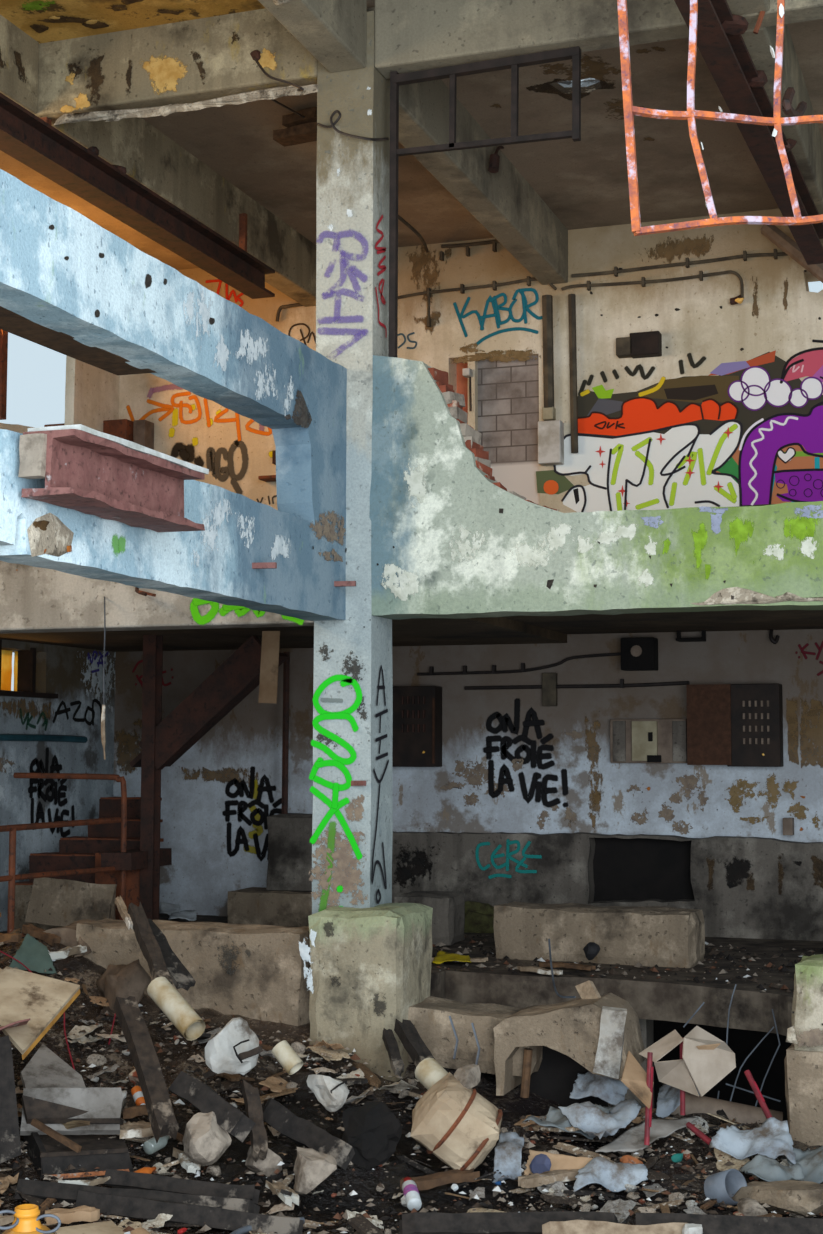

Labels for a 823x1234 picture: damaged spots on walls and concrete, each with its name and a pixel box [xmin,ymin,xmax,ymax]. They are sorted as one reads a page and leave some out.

flaking render [428,343,664,587]
peeling [404,458,428,508]
peeling [699,506,728,534]
peeling [794,505,823,519]
peeling [763,537,819,560]